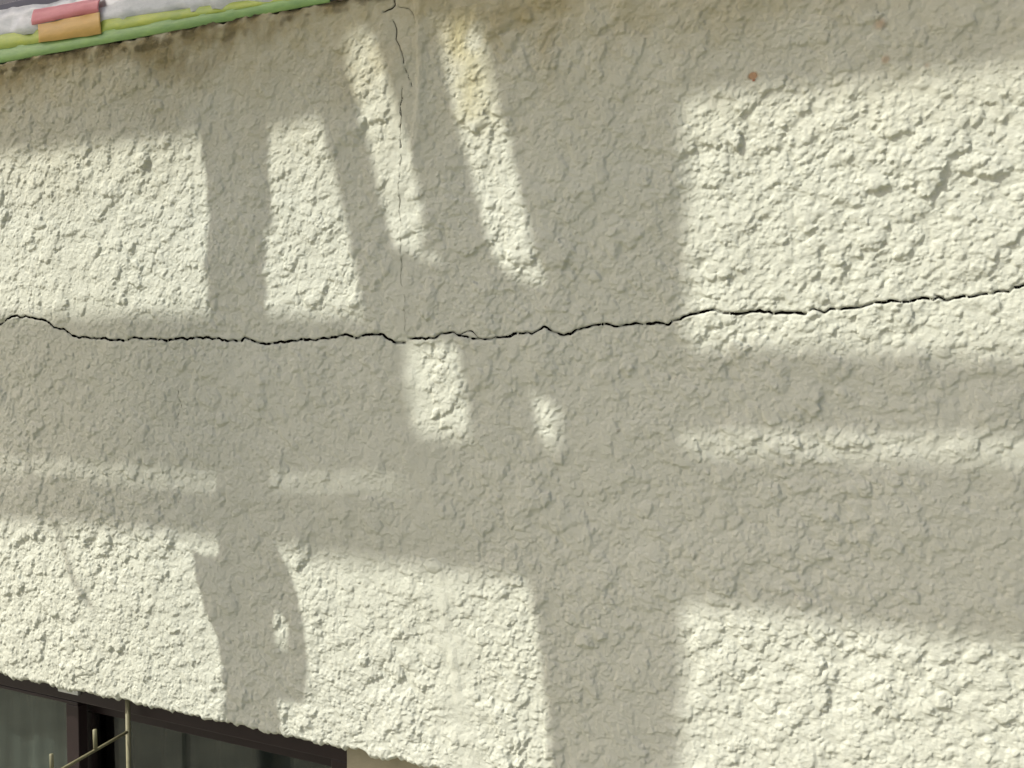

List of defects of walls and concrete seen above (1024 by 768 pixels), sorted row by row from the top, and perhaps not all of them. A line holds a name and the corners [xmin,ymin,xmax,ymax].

crack [0,1,1024,345]